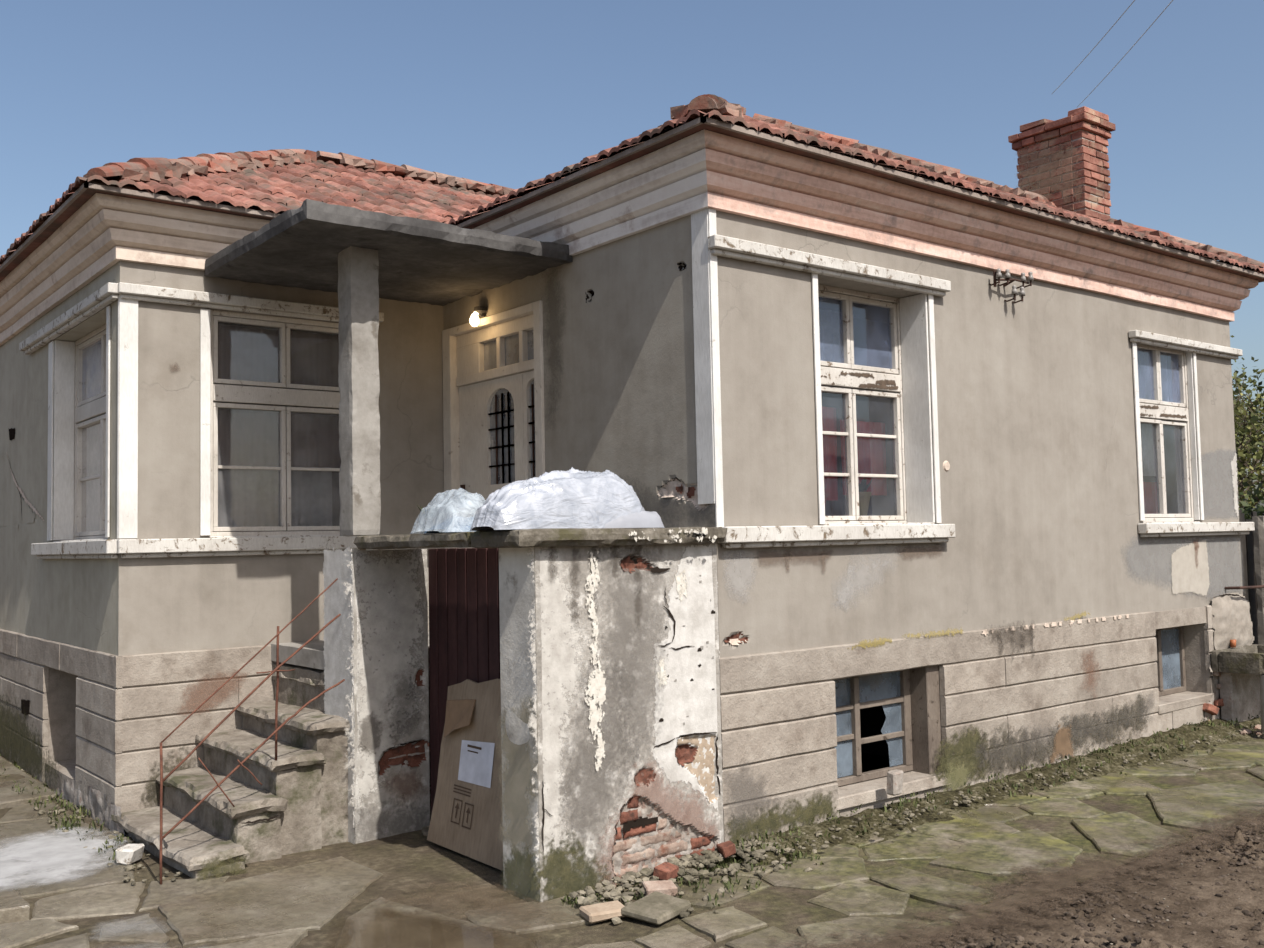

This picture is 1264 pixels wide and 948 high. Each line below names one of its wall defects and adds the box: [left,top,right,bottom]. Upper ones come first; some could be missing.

peeling [821,371,898,390]
flaking render [657,477,710,511]
crack [658,588,695,650]
peeling [345,548,430,807]
peeling [529,547,606,876]
peeling [611,543,748,896]
damp [978,695,1147,777]